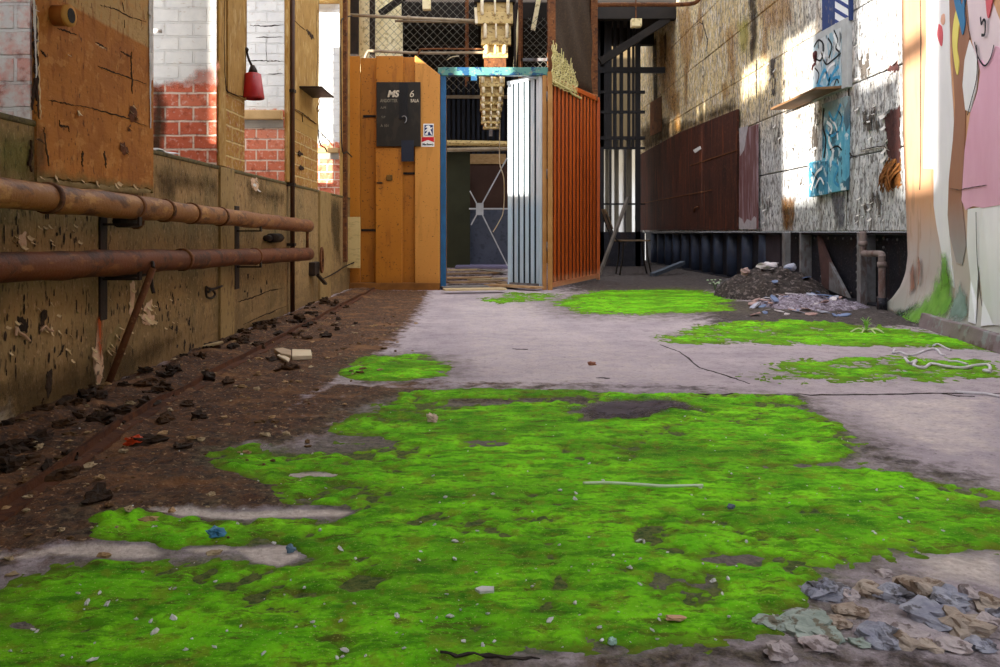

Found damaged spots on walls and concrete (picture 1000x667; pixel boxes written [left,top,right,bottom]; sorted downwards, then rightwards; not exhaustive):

crack [27,2,146,172]
peeling [765,58,785,101]
peeling [854,45,899,82]
peeling [807,102,820,157]
spalling [855,103,901,164]
corrosion [641,109,739,230]
peeling [855,191,888,223]
peeling [3,214,88,251]
peeling [4,281,200,397]
crack [662,345,750,395]
crack [803,391,1000,399]